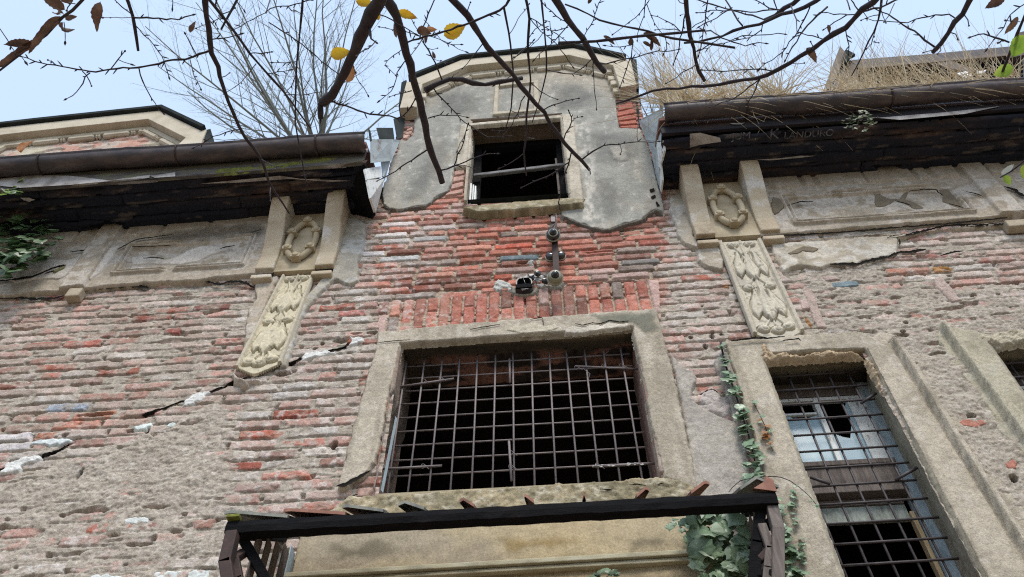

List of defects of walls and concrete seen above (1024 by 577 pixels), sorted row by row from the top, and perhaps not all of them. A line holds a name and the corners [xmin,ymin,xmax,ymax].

flaking render [617,102,637,129]
crack [784,189,1007,266]
flaking render [788,246,819,255]
crack [289,336,410,367]
spalling [761,344,882,395]
crack [142,376,250,418]
crack [0,444,70,475]